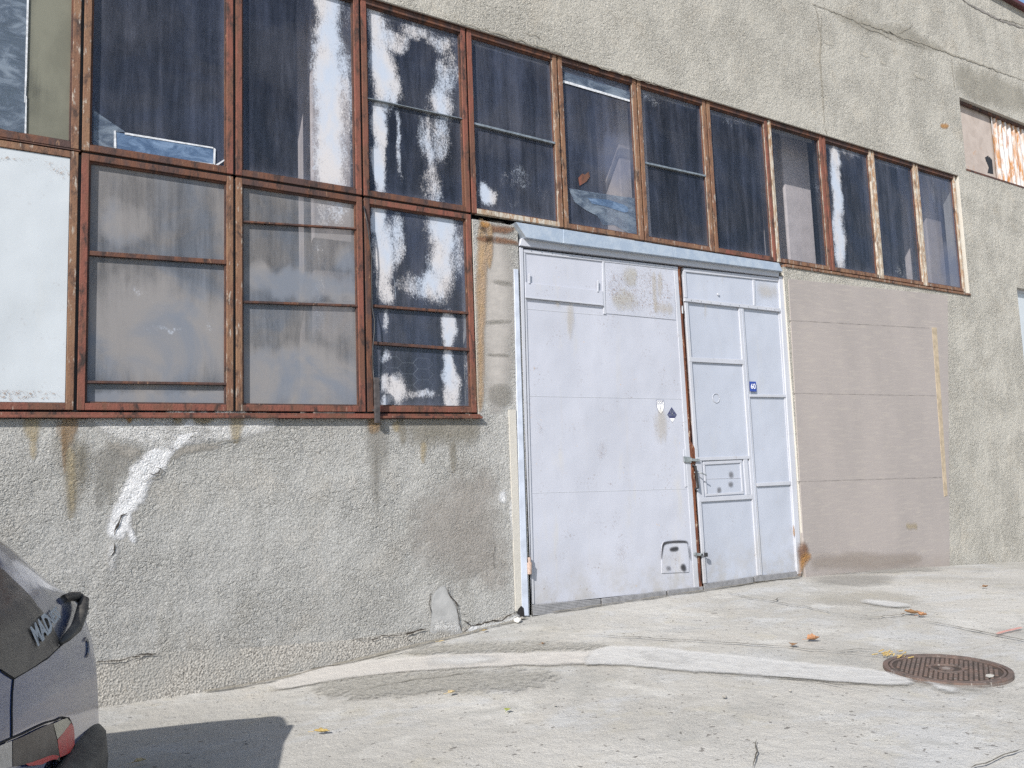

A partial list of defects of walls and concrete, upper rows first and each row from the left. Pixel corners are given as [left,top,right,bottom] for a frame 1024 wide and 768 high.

crack [813,0,1023,137]
rust [476,222,518,409]
rust [62,418,77,479]
peeling [91,418,277,570]
rust [793,526,810,572]
crack [302,591,517,671]